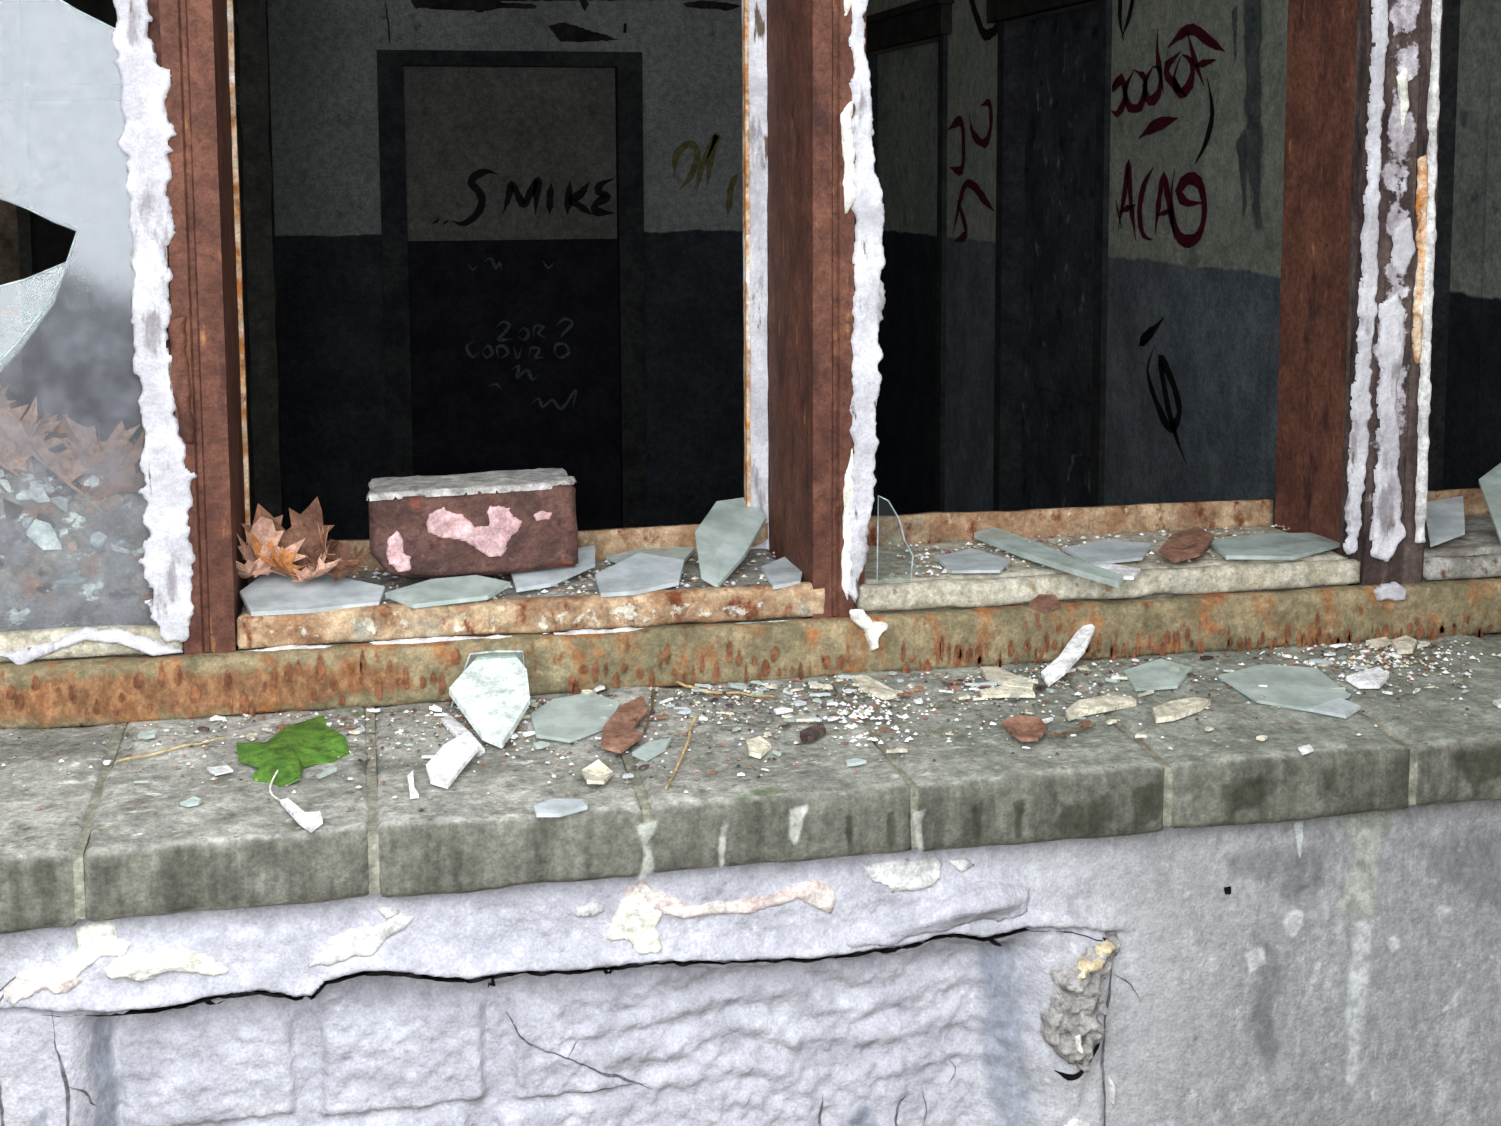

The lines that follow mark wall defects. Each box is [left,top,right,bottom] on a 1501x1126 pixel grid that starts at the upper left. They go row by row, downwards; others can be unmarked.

corrosion [0,647,461,722]
corrosion [568,641,850,695]
corrosion [901,632,1064,673]
corrosion [1082,613,1493,661]
damp [636,821,657,878]
damp [790,805,807,842]
peeling [575,879,836,954]
damp [1330,812,1399,1085]
crack [45,928,1140,1126]
spalling [1040,931,1121,1073]
crack [0,1085,8,1126]
spalling [1108,1075,1116,1105]